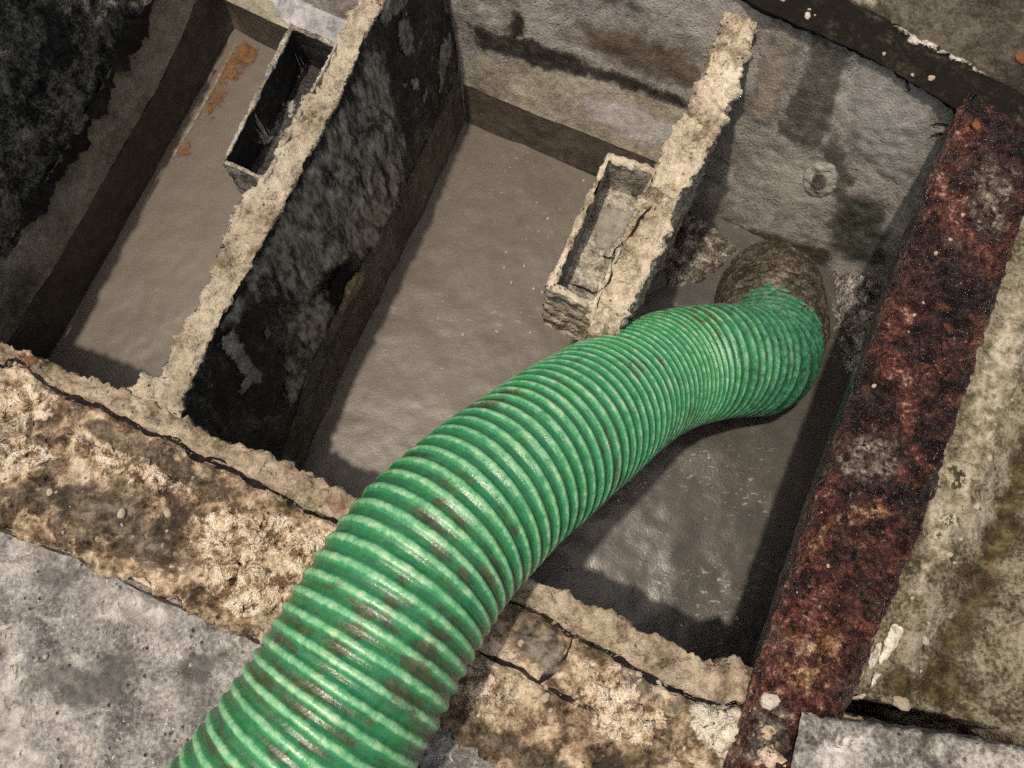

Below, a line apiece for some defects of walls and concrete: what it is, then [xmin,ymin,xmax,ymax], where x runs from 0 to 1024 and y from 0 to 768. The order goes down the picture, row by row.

corrosion [174,43,256,155]
leakage [466,10,701,107]
leakage [740,20,932,264]
corrosion [967,159,1022,237]
crack [550,204,653,294]
crack [0,358,338,524]
corrosion [802,429,903,559]
leakage [88,583,172,631]
crack [477,601,738,712]
corrosion [778,633,843,695]
corrosion [736,706,790,761]